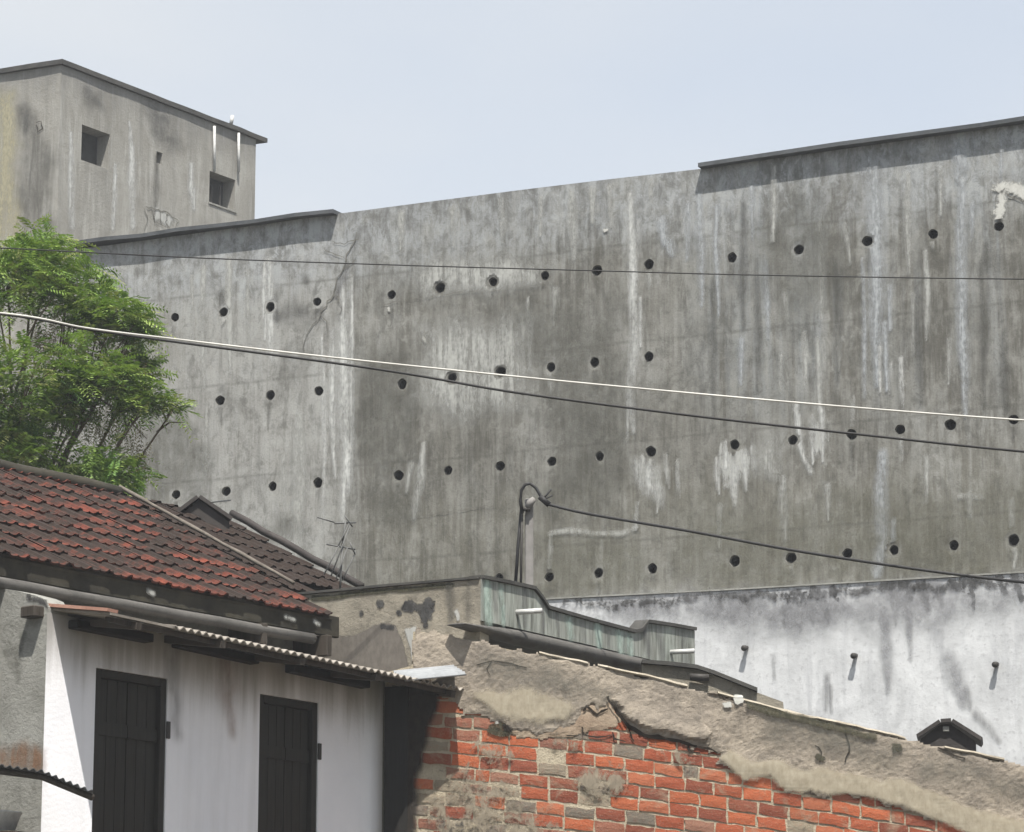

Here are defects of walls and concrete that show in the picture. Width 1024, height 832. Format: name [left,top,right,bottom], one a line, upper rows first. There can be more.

crack [303,232,358,352]
water stain [626,193,651,433]
water stain [658,218,673,255]
water stain [686,193,720,316]
water stain [802,332,822,411]
water stain [862,157,930,392]
water stain [947,142,974,415]
water stain [794,403,812,472]
water stain [548,450,1024,655]
peeling [474,688,573,737]
spalling [722,694,744,708]
peeling [721,750,1024,832]